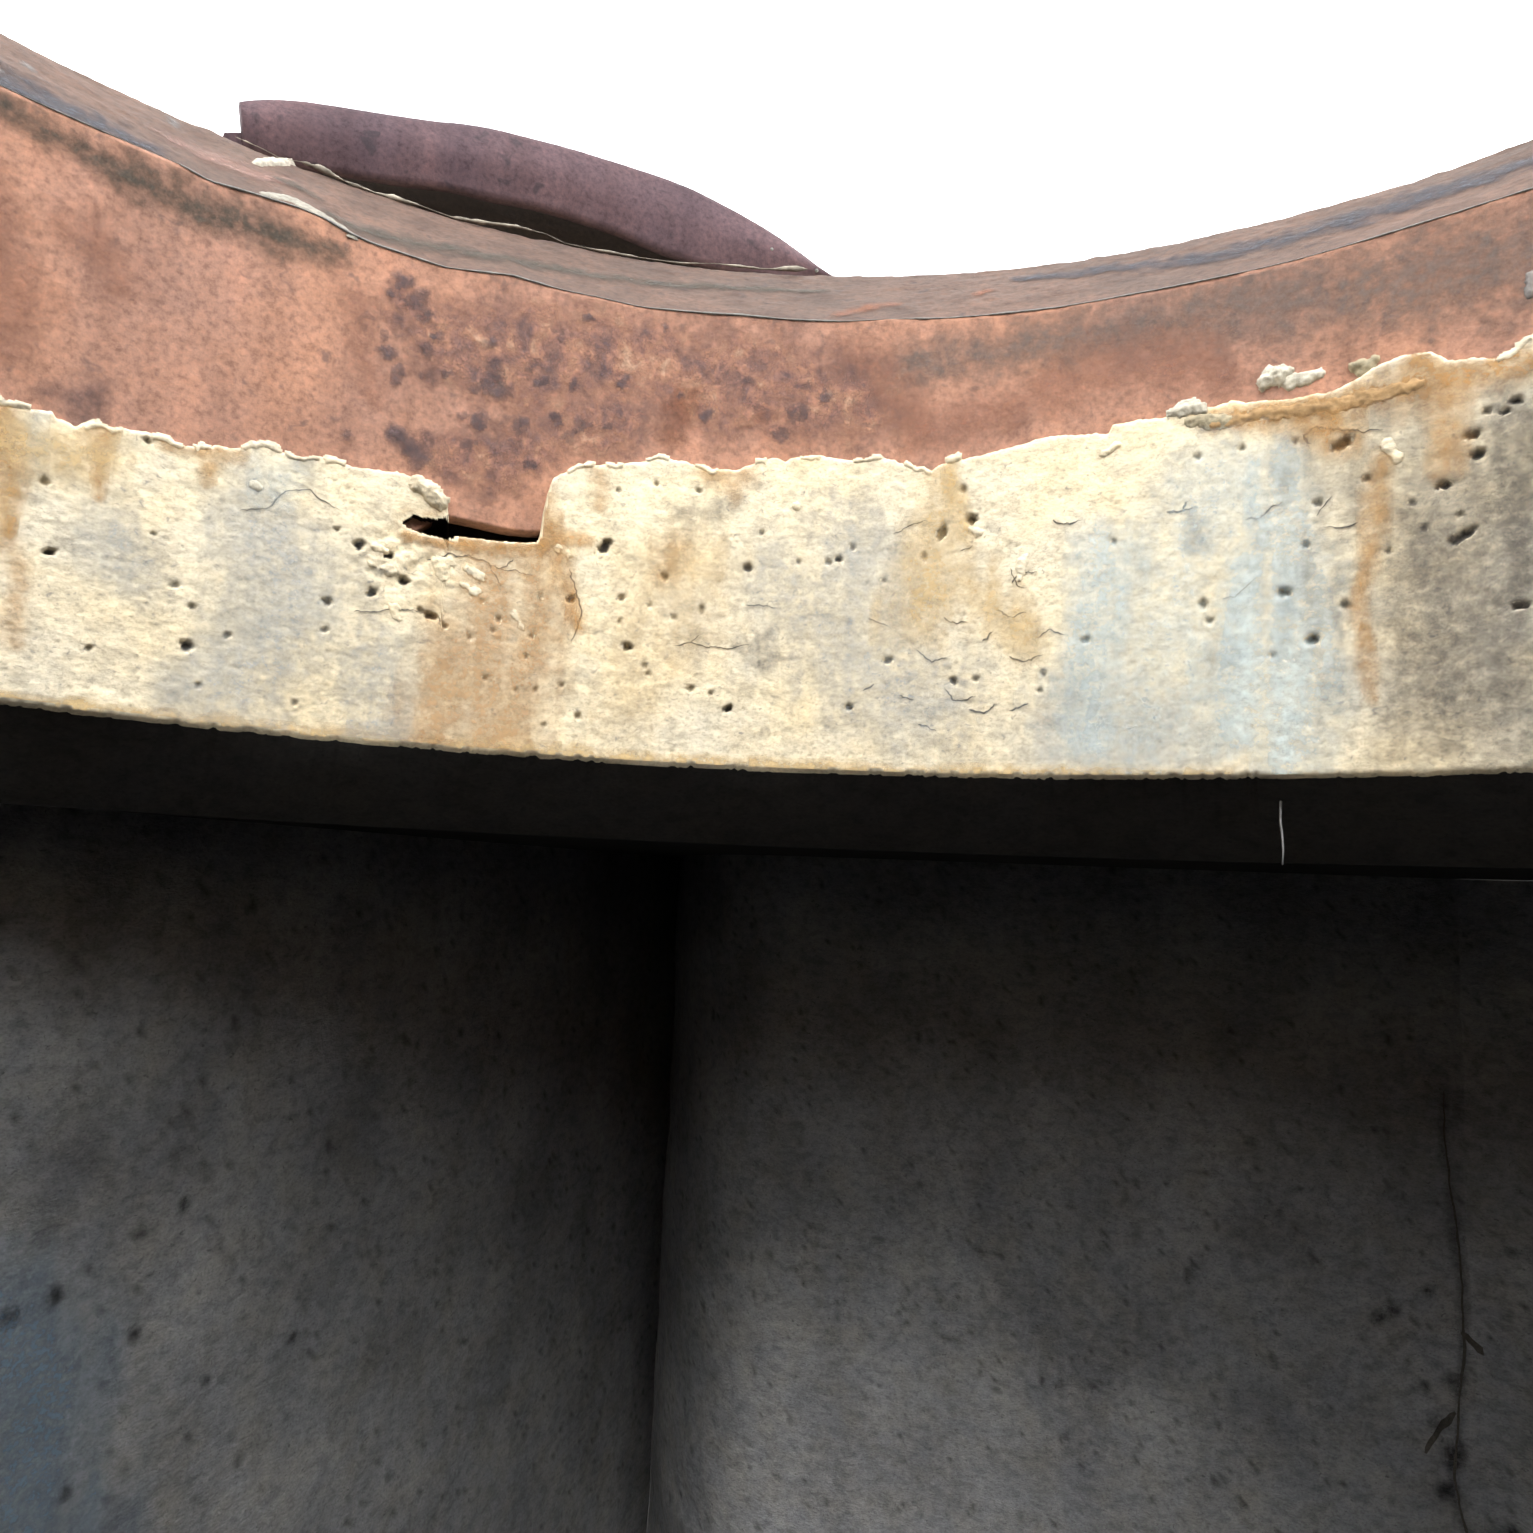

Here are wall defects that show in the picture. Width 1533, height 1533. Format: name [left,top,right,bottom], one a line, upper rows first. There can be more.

rust [168,137,298,186]
damp [899,223,1533,382]
rust [1214,352,1533,455]
spalling [567,461,624,474]
spalling [646,453,670,462]
spalling [853,454,884,463]
spalling [904,452,962,476]
damp [0,513,902,772]
rust [404,521,592,750]
damp [1220,449,1340,774]
damp [920,766,1165,775]
crack [1425,1091,1484,1533]